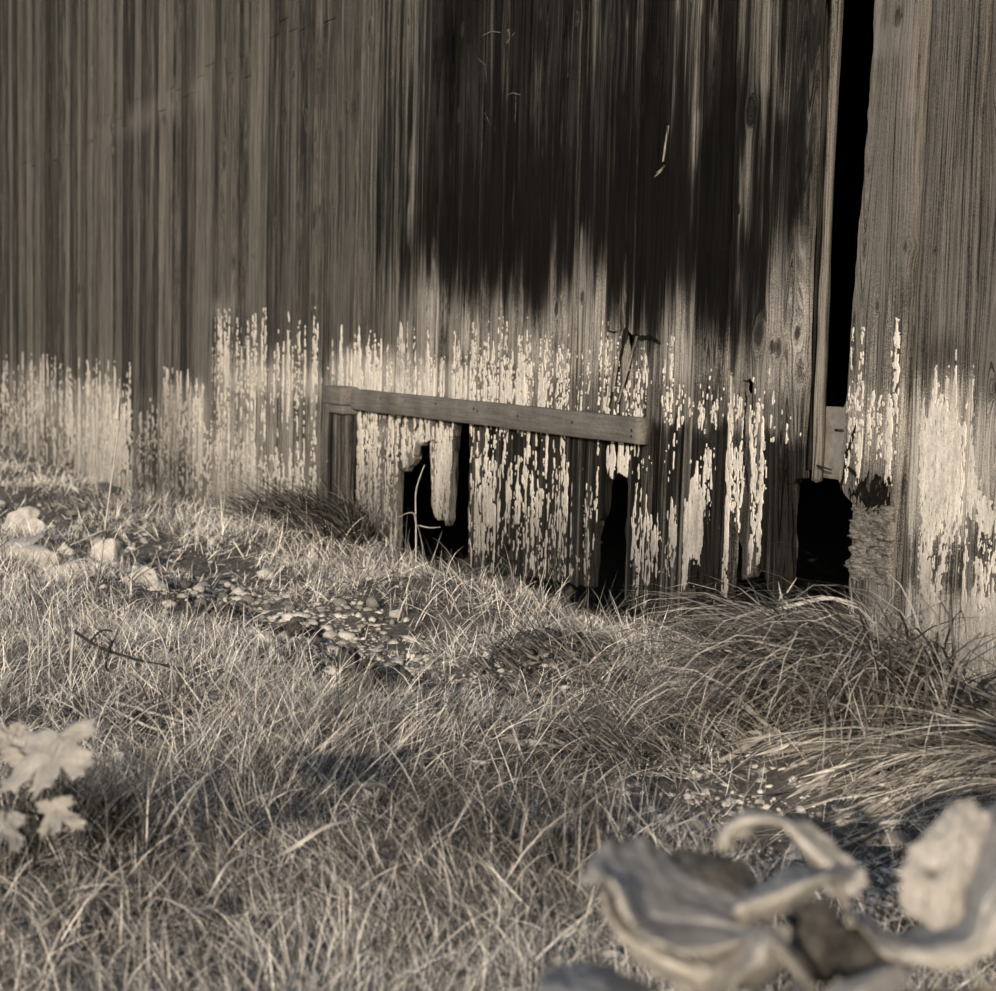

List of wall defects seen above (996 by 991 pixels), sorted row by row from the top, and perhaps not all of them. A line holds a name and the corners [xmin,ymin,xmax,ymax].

peeling [0,307,801,608]
peeling [844,318,901,486]
peeling [916,349,996,702]